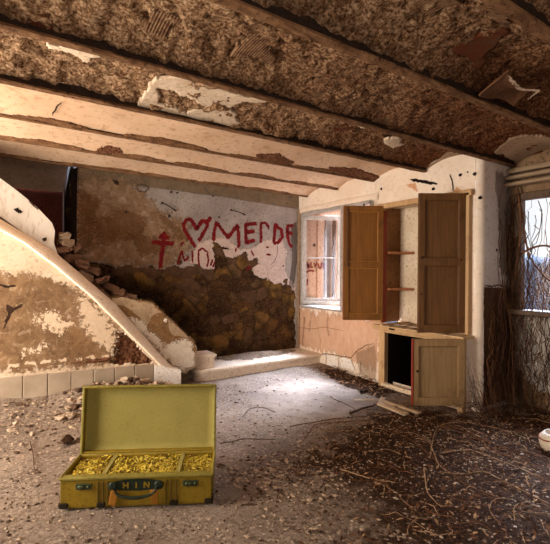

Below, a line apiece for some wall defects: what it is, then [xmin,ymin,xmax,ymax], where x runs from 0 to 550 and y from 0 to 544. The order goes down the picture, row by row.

peeling [46,42,102,63]
peeling [138,75,267,126]
flaking render [13,114,87,130]
flaking render [0,135,82,150]
flaking render [95,145,166,162]
flaking render [124,133,208,151]
peeling [383,136,404,148]
flaking render [229,153,380,181]
flaking render [71,237,297,357]
flaking render [3,304,23,329]
peeling [8,295,152,368]
crack [300,313,373,369]